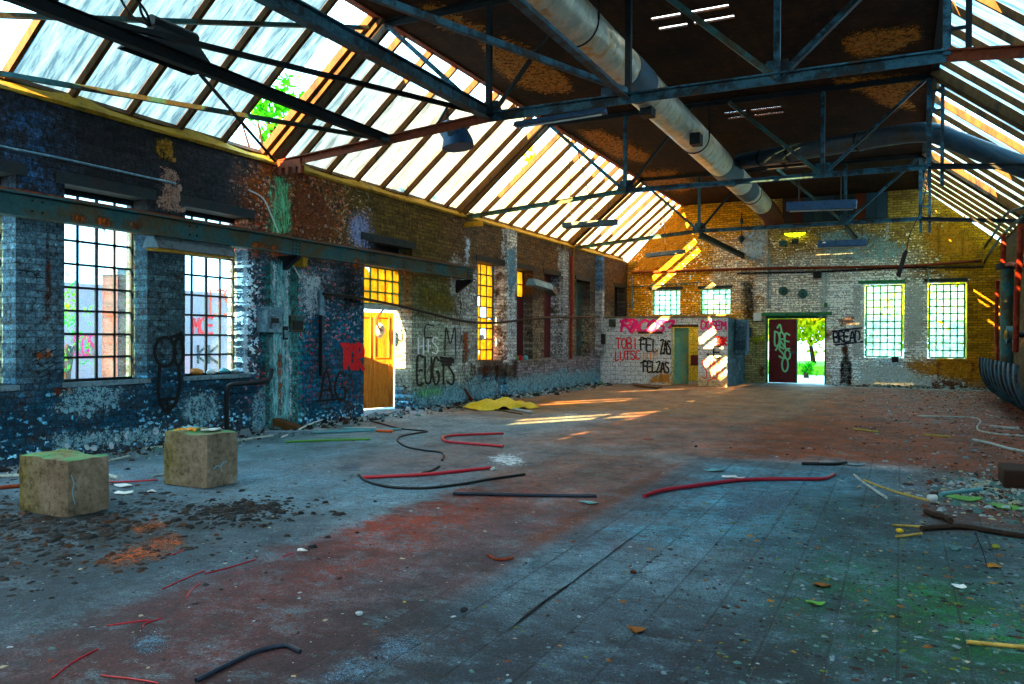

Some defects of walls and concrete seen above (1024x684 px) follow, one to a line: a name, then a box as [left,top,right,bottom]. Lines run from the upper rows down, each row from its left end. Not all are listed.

spalling [154,137,186,213]
peeling [84,431,129,451]